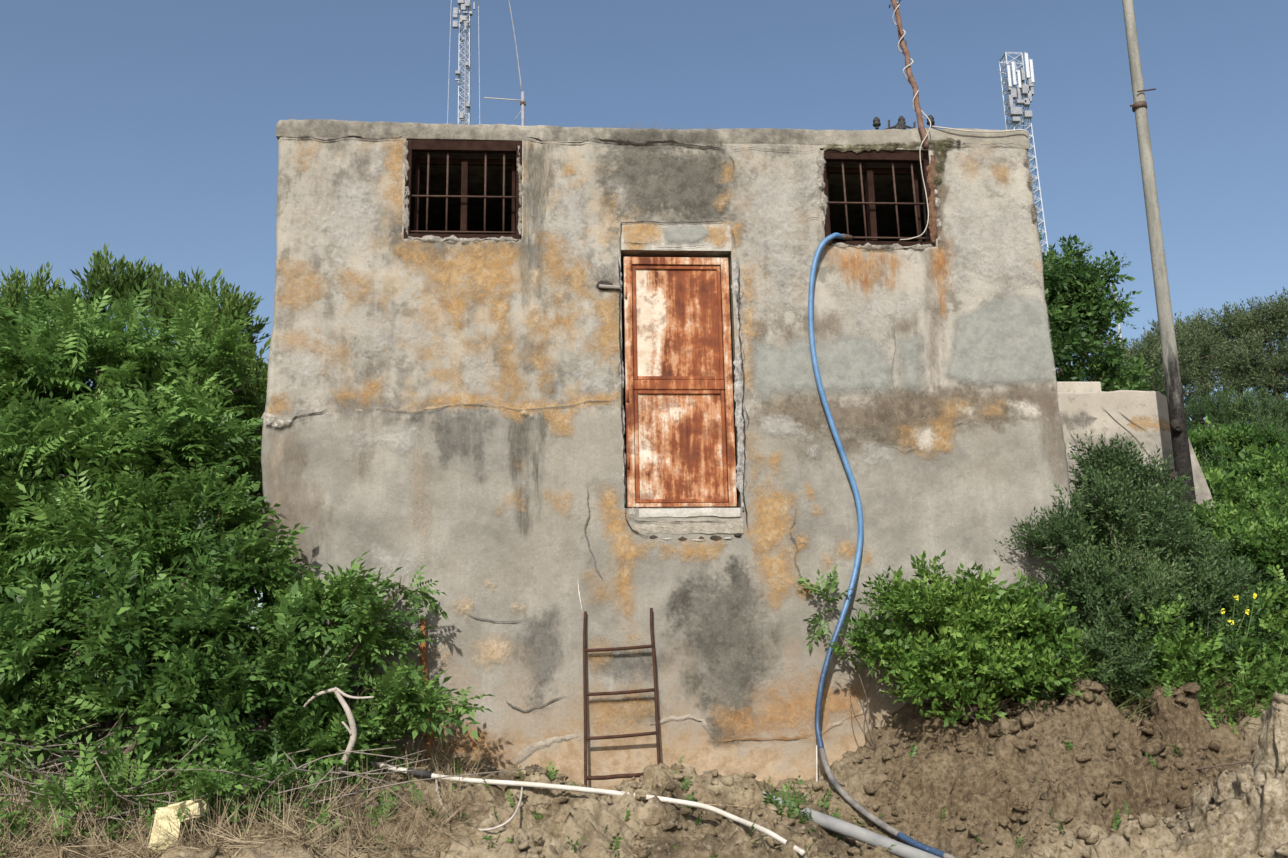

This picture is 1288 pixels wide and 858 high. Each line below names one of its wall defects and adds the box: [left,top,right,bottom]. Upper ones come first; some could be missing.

water stain [598,130,737,224]
crack [380,220,782,537]
water stain [339,401,482,458]
water stain [509,412,547,471]
peeling [919,429,933,448]
crack [582,486,604,583]
water stain [673,558,776,743]